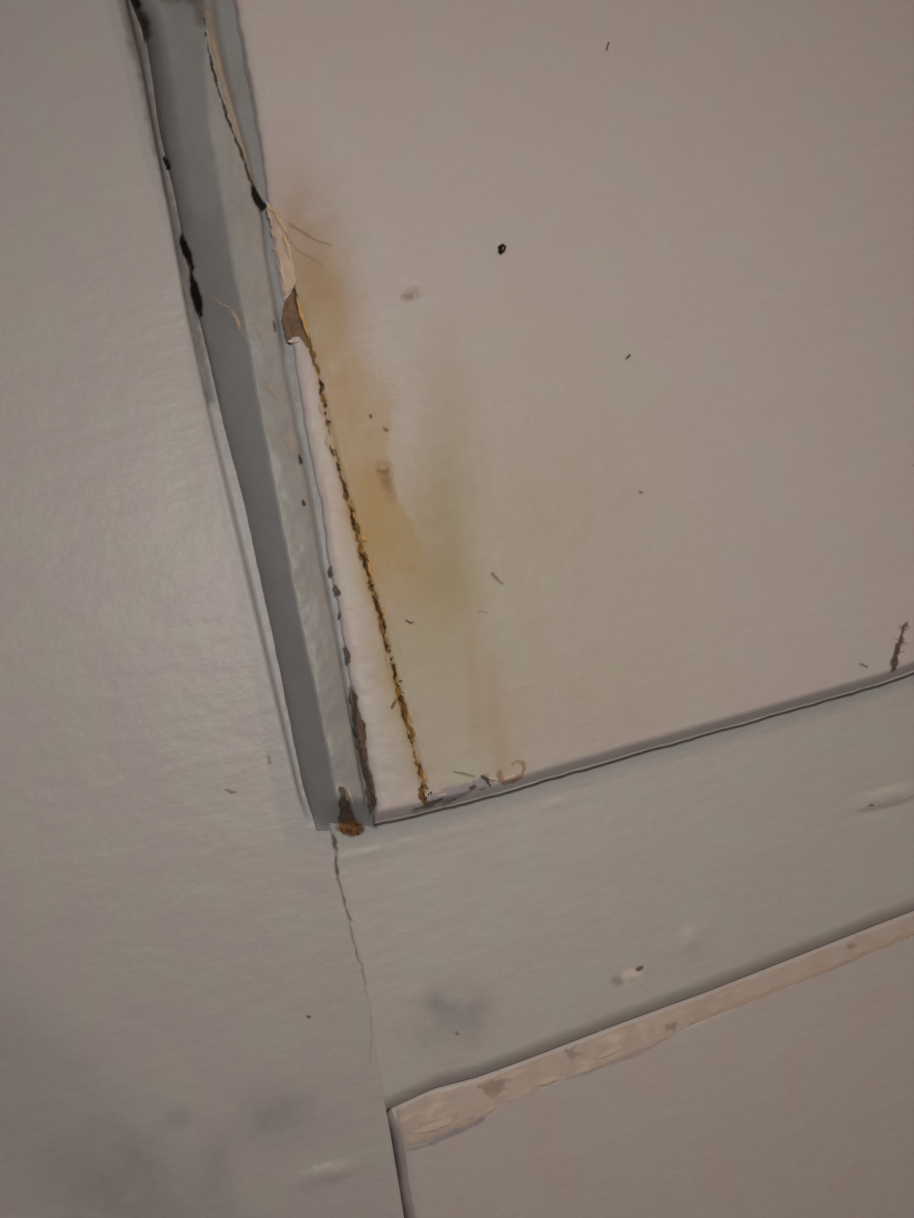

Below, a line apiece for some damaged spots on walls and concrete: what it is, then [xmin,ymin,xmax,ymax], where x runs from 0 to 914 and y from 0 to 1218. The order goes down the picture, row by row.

peeling [261,202,312,349]
peeling [338,786,354,822]
peeling [350,686,377,810]